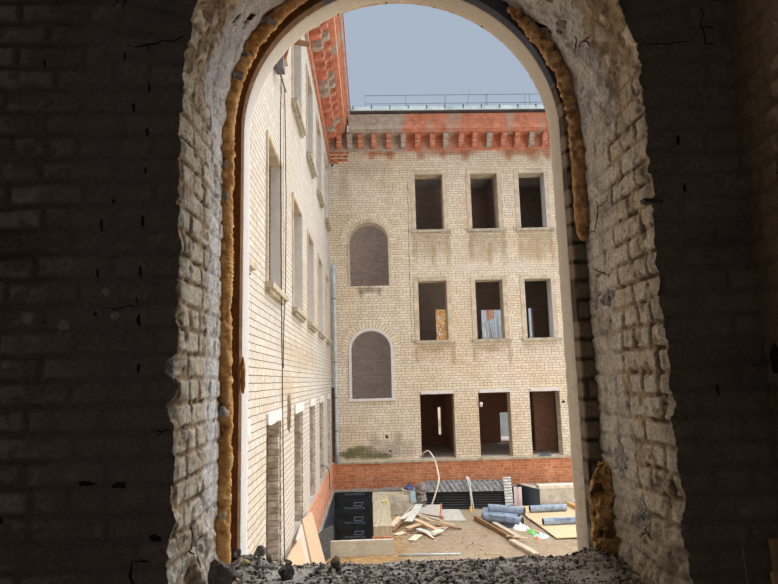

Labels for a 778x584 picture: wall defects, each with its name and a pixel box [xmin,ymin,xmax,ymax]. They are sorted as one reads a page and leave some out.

crack [129,560,150,584]